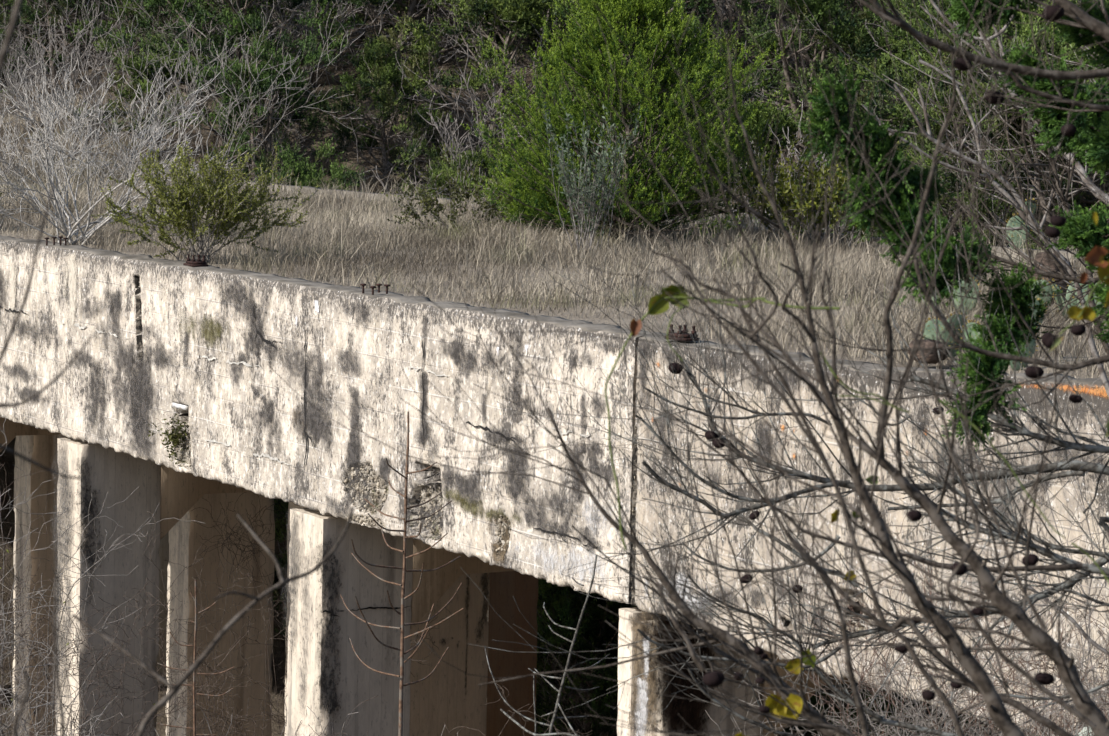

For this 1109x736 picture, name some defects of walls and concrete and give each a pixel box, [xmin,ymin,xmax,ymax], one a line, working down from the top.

water stain [51,437,101,708]
water stain [0,253,188,460]
spalling [172,402,189,416]
spalling [173,430,192,469]
water stain [221,279,381,517]
water stain [282,512,342,719]
spalling [342,462,389,528]
water stain [379,458,390,486]
water stain [413,318,438,461]
water stain [408,469,481,539]
water stain [441,331,617,583]